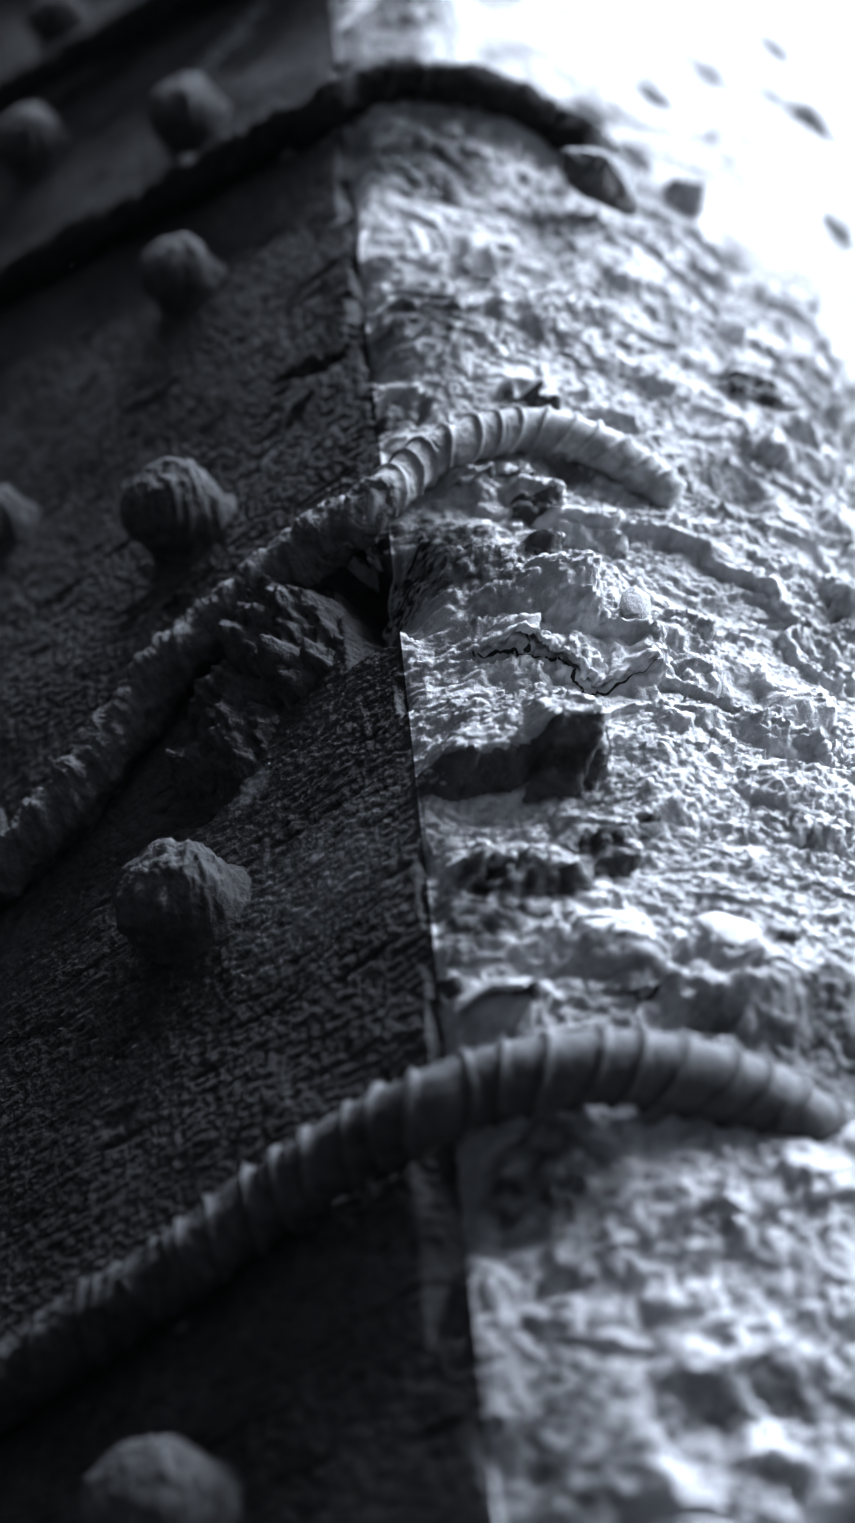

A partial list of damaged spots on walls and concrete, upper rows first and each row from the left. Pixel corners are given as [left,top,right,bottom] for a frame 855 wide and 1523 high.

crack [457,634,663,696]